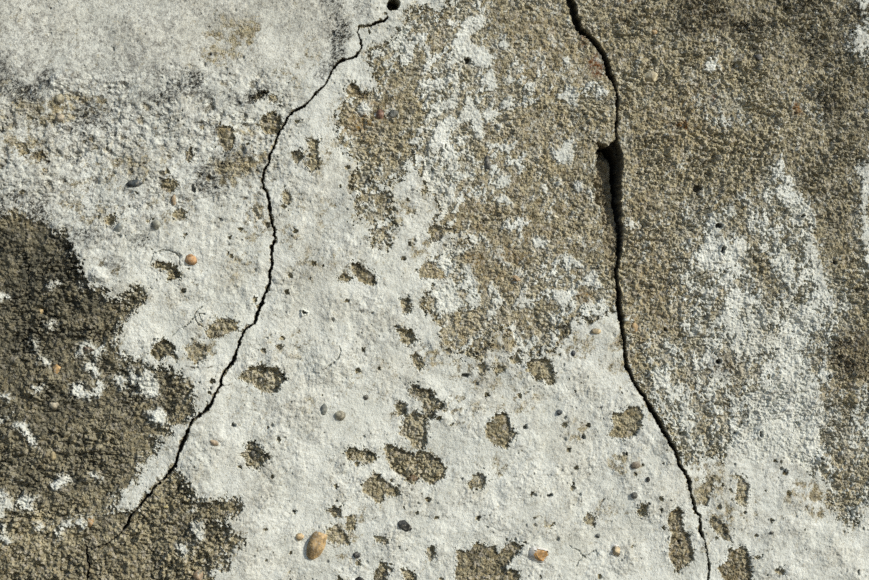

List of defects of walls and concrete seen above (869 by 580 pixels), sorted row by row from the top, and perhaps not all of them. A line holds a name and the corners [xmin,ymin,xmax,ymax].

peeling [172,208,188,220]
crack [85,0,395,580]
peeling [338,0,869,528]
crack [566,0,711,580]
peeling [0,212,243,580]
spalling [239,363,288,395]
peeling [454,541,525,580]
peeling [667,506,696,576]
peeling [697,474,764,580]